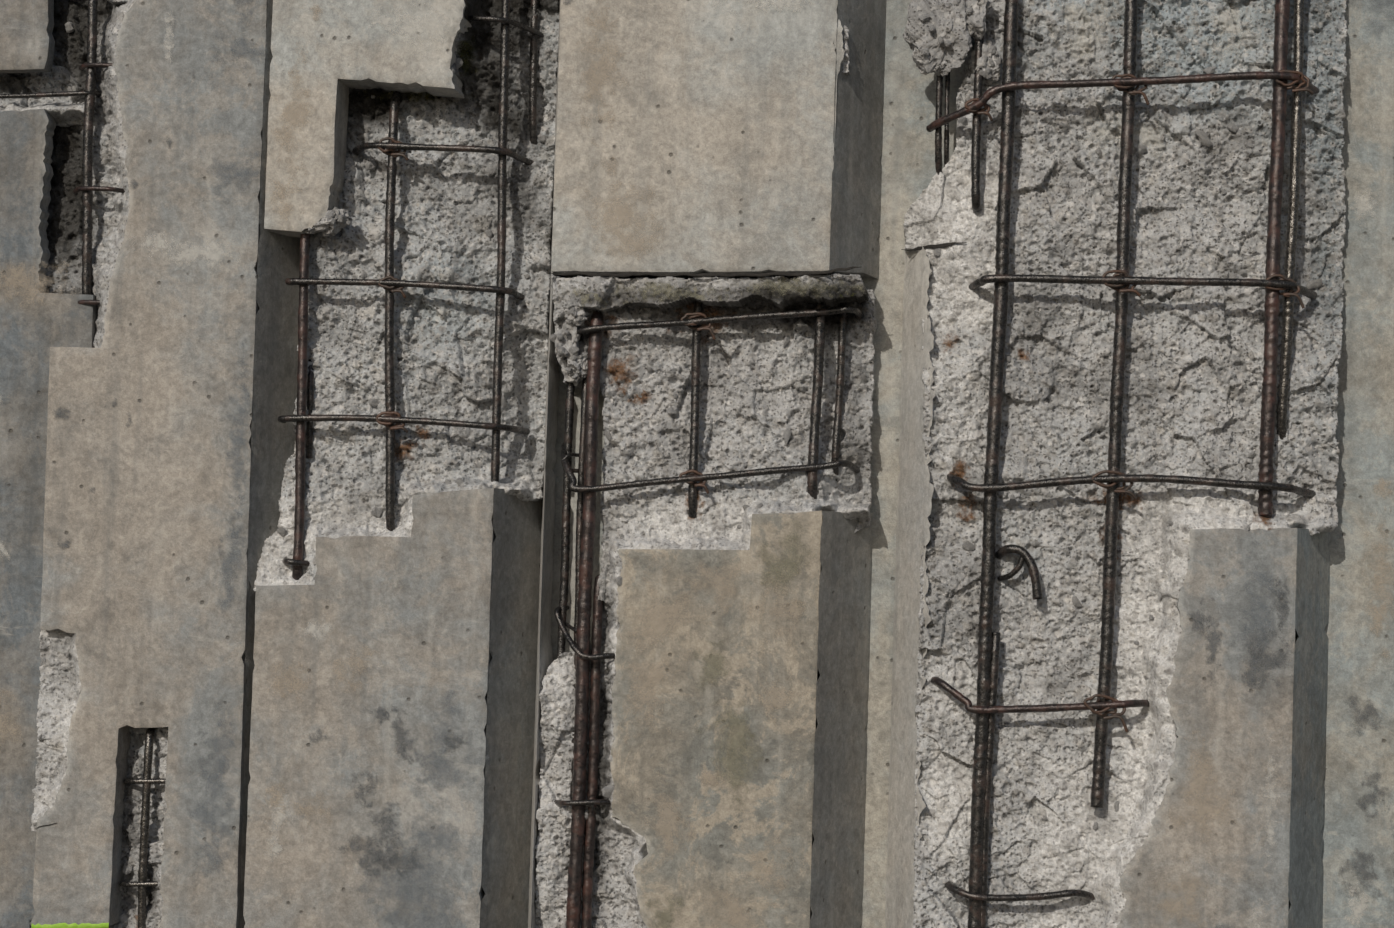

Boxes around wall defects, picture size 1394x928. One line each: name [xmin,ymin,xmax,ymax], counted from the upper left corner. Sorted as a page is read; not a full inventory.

corrosion [395,429,429,460]
spalling [253,0,877,928]
corrosion [605,359,648,403]
corrosion [949,461,969,478]
corrosion [1095,492,1141,510]
spalling [903,0,1347,928]
spalling [31,629,81,831]
spalling [109,726,168,928]